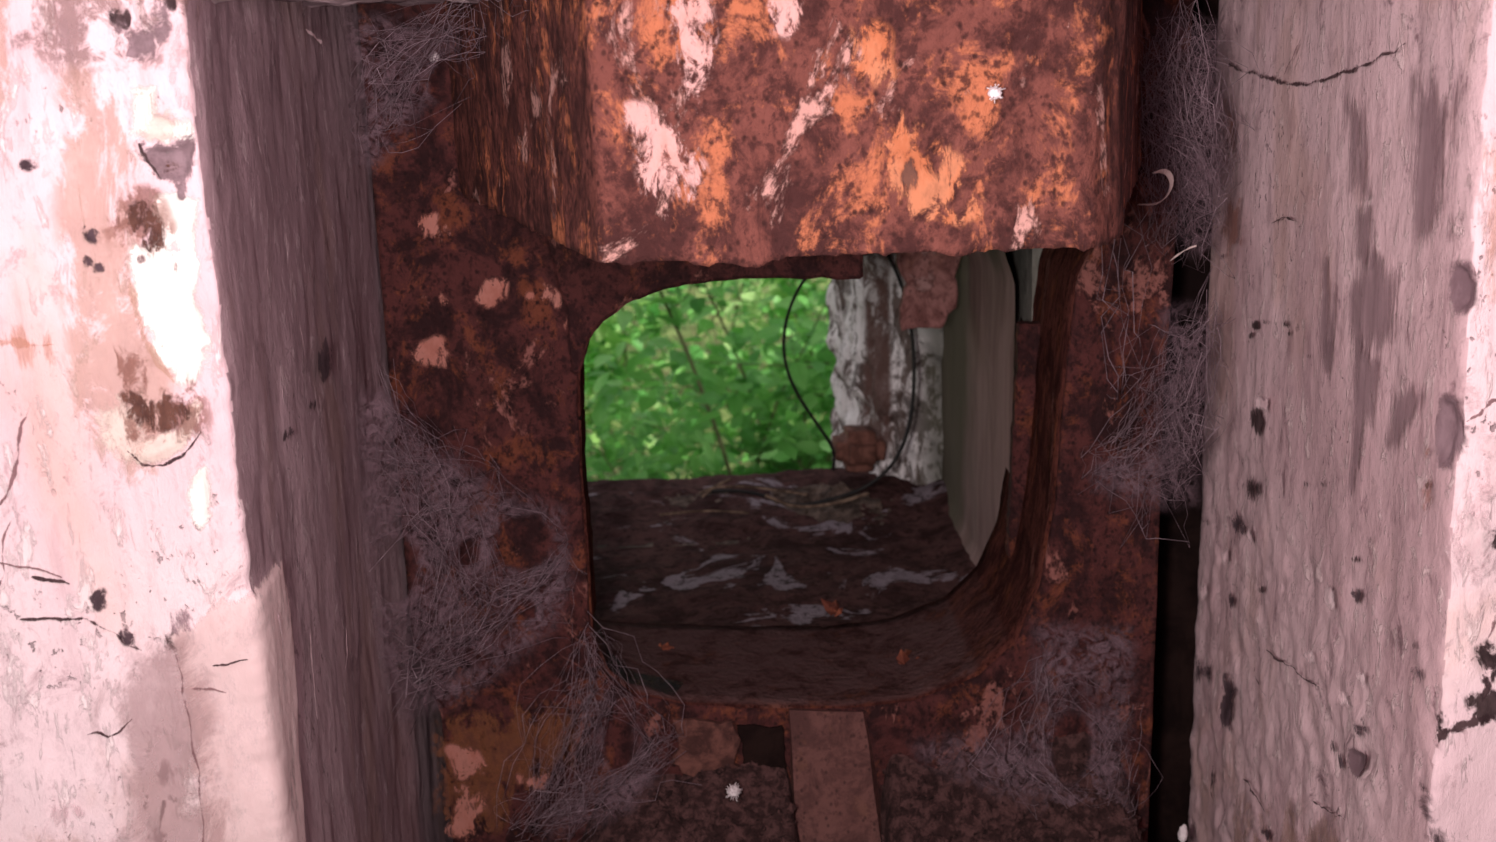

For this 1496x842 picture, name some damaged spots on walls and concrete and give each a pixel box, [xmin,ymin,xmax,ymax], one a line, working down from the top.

rust [851,21,895,85]
crack [1228,42,1405,87]
rust [877,114,982,226]
spalling [95,85,212,467]
rust [896,252,962,331]
crack [1466,399,1496,422]
crack [0,416,138,649]
spalling [188,466,212,529]
crack [1436,618,1496,743]